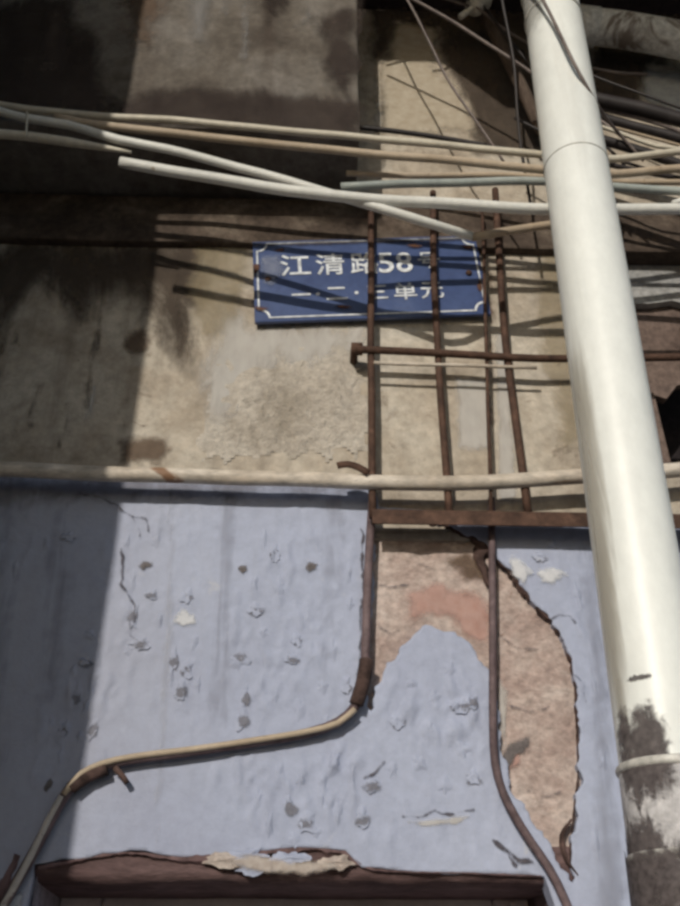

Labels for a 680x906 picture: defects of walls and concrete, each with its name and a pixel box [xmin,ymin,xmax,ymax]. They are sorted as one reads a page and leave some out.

water stain [0,0,361,139]
water stain [374,22,475,132]
water stain [125,329,148,352]
water stain [120,438,167,460]
spalling [367,540,581,847]
spalling [38,847,541,878]